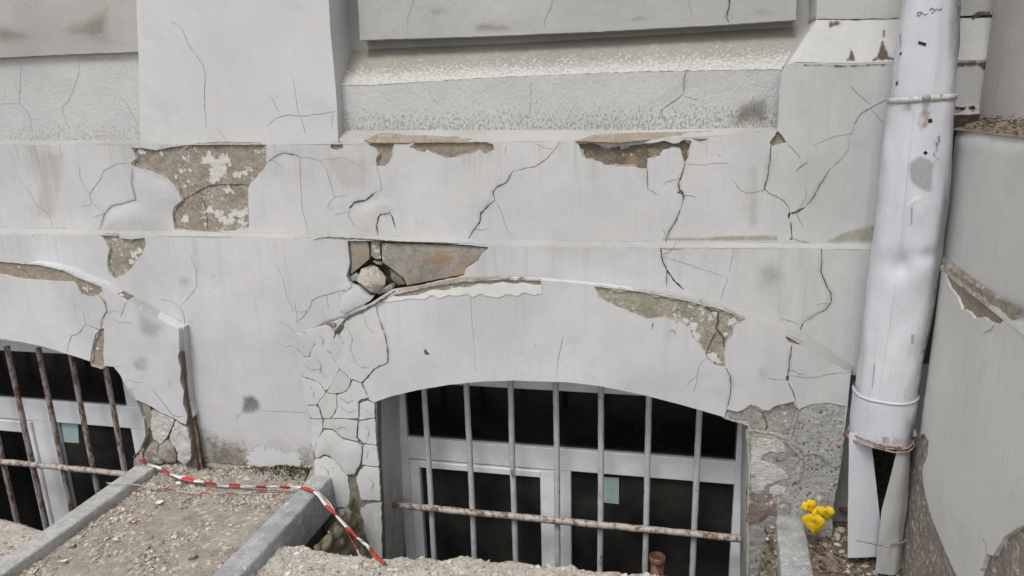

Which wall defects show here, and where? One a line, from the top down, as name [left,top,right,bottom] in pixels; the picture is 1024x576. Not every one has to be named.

crack [79,163,136,229]
spalling [132,141,267,232]
crack [269,81,558,244]
spalling [364,133,495,166]
spalling [575,131,709,169]
peeling [0,233,146,300]
spalling [340,241,542,313]
spalling [595,285,745,367]
crack [647,89,887,484]
spalling [947,268,1022,323]
crack [236,265,396,559]
spalling [722,402,802,576]